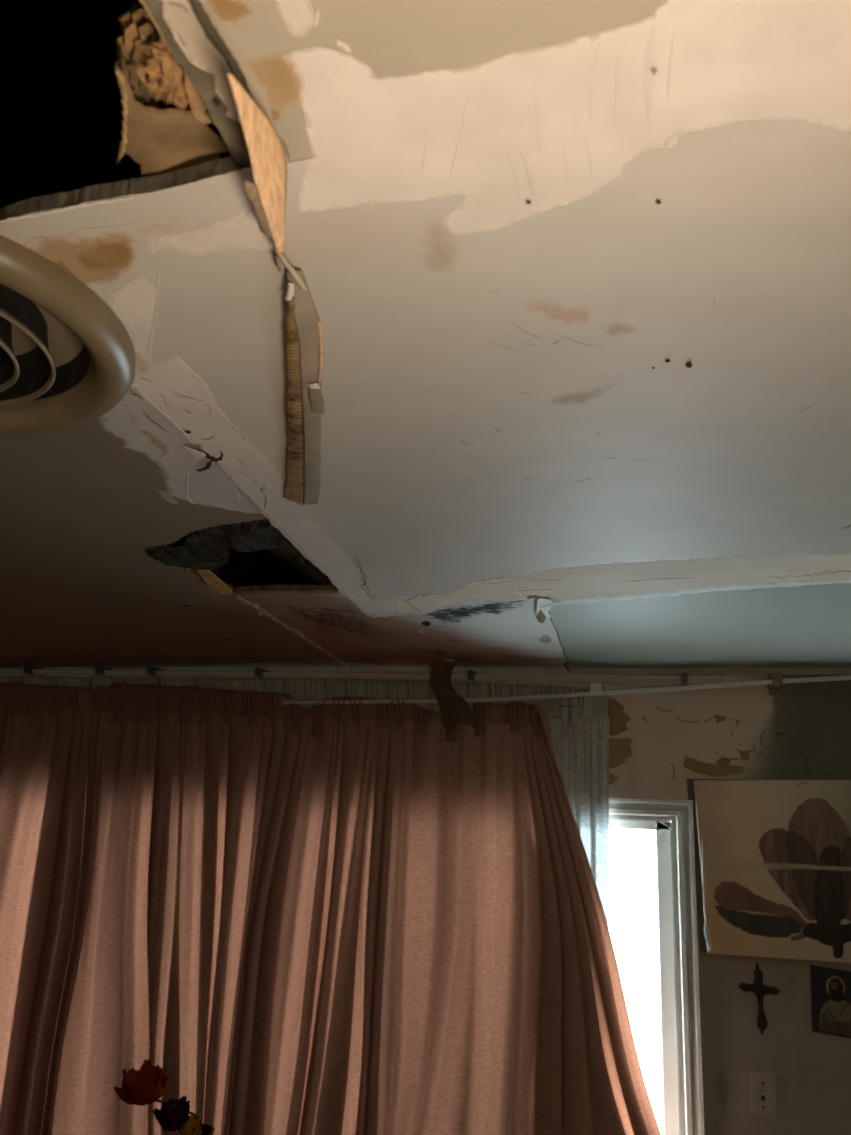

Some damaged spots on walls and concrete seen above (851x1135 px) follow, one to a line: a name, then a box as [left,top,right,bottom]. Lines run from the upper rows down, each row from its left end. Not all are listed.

damp [213,0,248,19]
peeling [162,0,241,123]
damp [22,224,162,284]
crack [131,378,267,510]
damp [406,576,562,623]
peeling [608,698,635,785]
peeling [683,750,749,778]